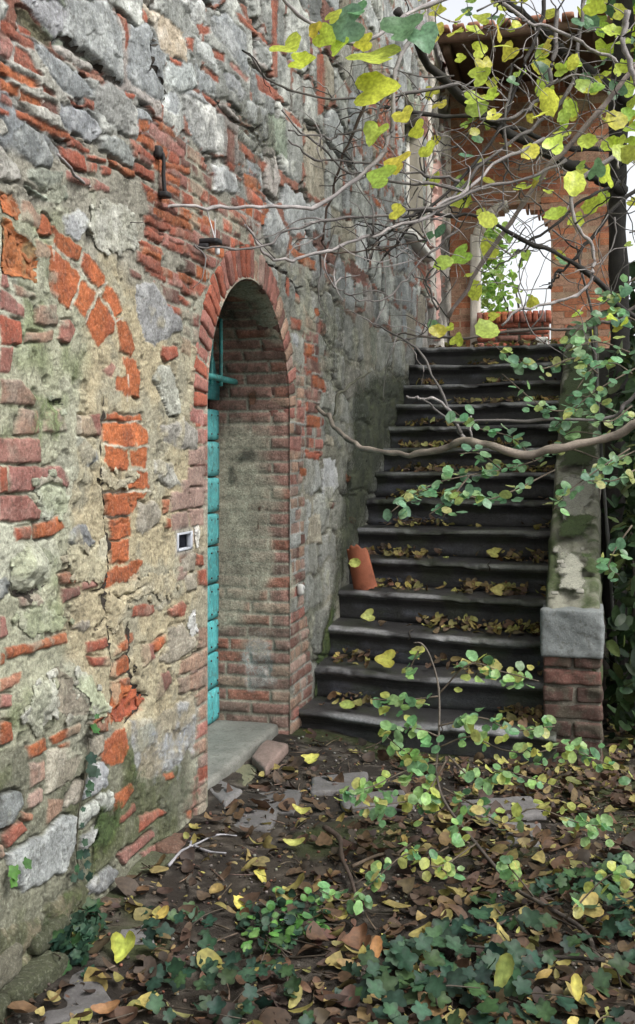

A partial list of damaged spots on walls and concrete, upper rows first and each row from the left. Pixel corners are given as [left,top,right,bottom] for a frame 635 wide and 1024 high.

crack [93,397,148,723]
flaking render [551,545,586,595]